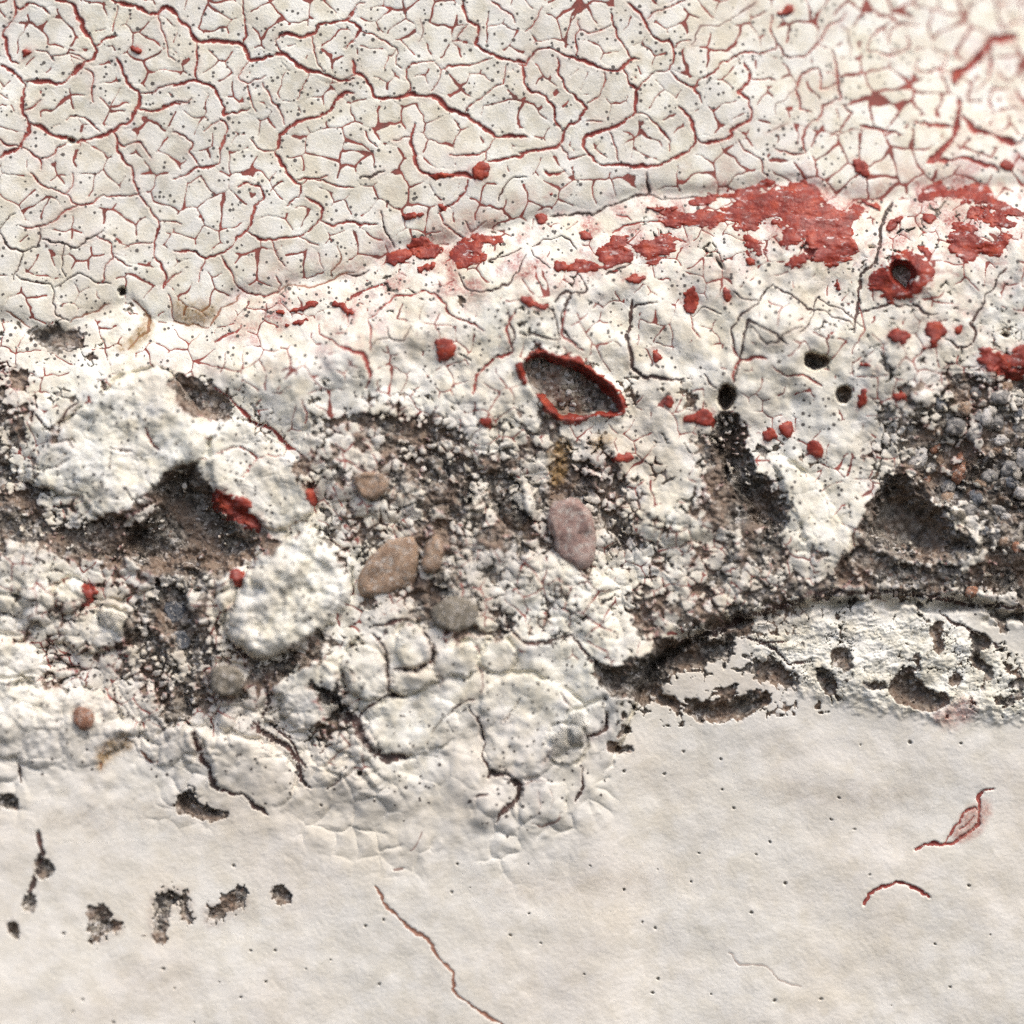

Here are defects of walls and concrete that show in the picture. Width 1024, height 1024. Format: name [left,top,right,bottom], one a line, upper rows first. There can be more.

crack [0,0,1024,552]
peeling [567,178,869,275]
peeling [917,180,1024,263]
spalling [0,361,262,728]
spalling [690,410,790,567]
spalling [834,344,1024,606]
crack [183,579,311,788]
crack [313,523,1024,828]
spalling [593,634,800,755]
crack [374,832,503,1024]
crack [863,881,930,905]
crack [915,788,994,851]